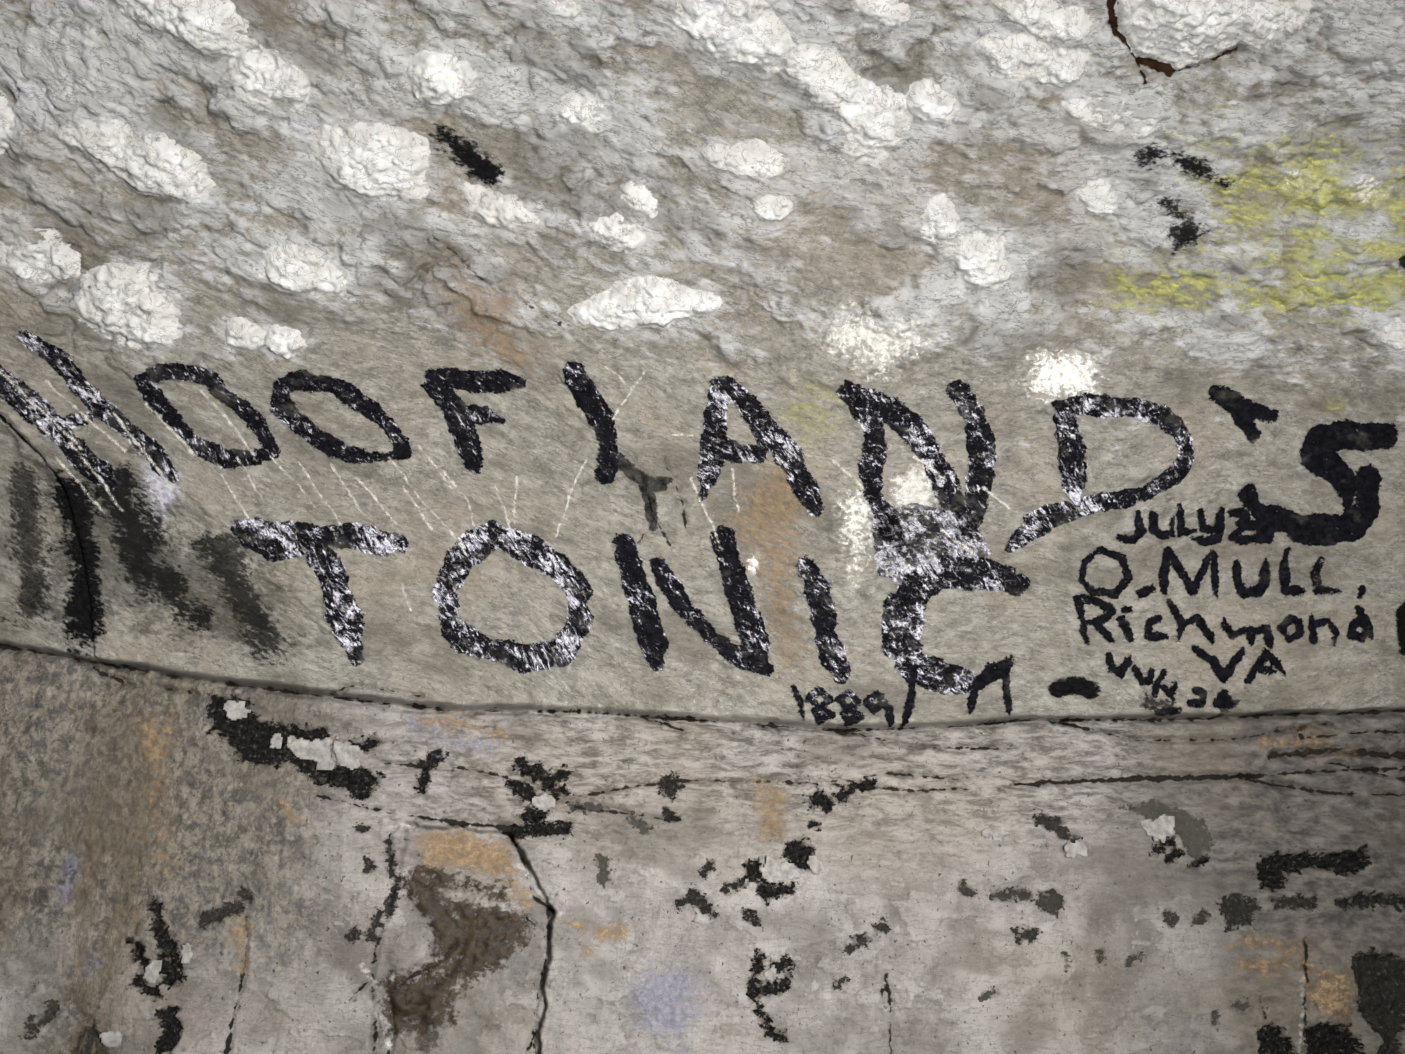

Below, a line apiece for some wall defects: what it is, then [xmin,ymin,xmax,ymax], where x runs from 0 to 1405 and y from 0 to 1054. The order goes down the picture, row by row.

crack [1107,0,1237,85]
crack [316,795,555,1054]